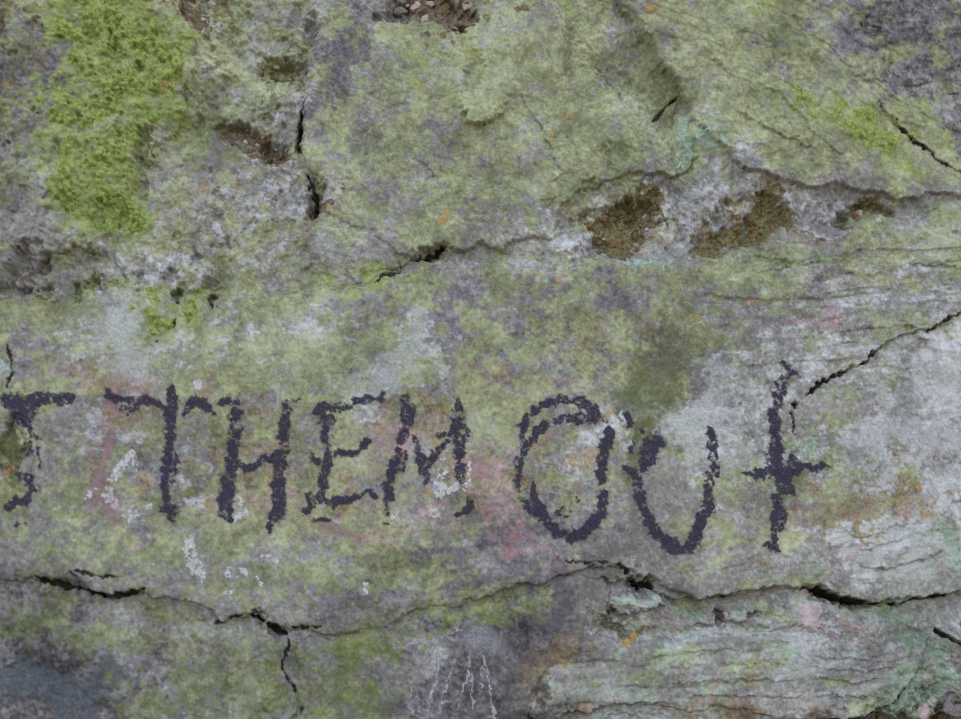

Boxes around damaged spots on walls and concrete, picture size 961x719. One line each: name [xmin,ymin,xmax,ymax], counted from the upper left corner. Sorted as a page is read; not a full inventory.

crack [297,115,305,153]
crack [880,105,961,172]
crack [308,177,320,219]
crack [418,246,445,262]
crack [376,272,398,282]
crack [926,313,958,332]
crack [791,354,874,429]
crack [40,570,139,599]
crack [566,560,653,590]
crack [216,613,318,716]